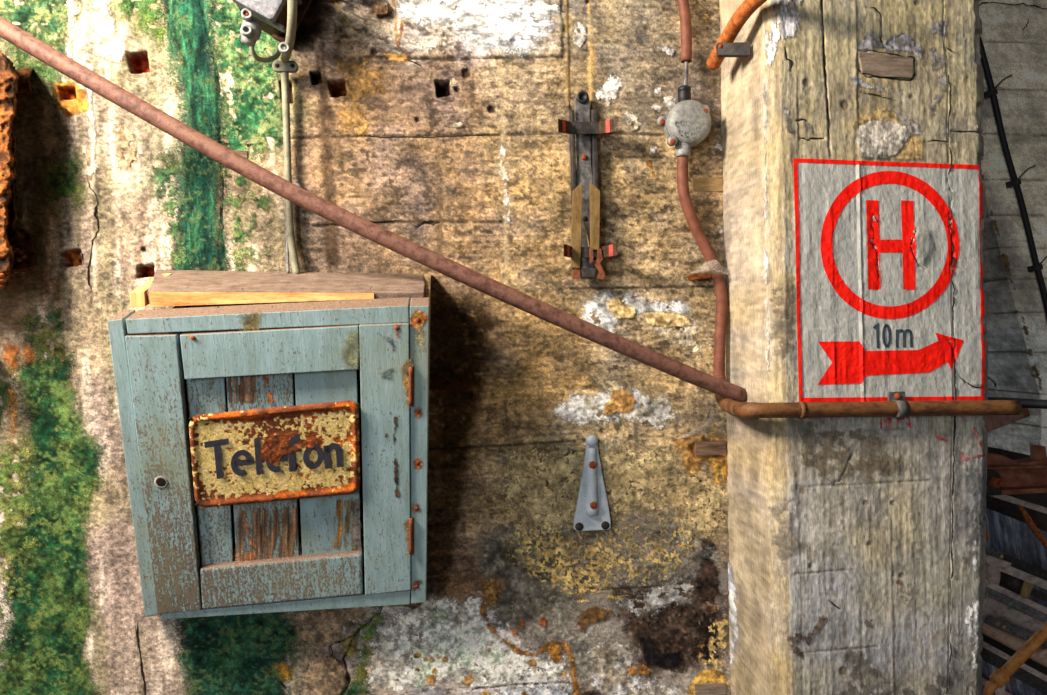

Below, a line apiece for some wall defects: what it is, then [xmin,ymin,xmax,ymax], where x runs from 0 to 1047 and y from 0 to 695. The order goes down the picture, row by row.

efflorescence [397,0,563,58]
peeling [850,20,947,116]
peeling [783,107,812,134]
spalling [853,89,924,161]
crack [78,179,99,303]
efflorescence [580,290,709,353]
crack [925,5,997,692]
efflorescence [553,374,678,429]
damp [359,524,738,695]
rust [576,606,613,632]
rust [413,652,448,685]
rust [628,665,652,676]